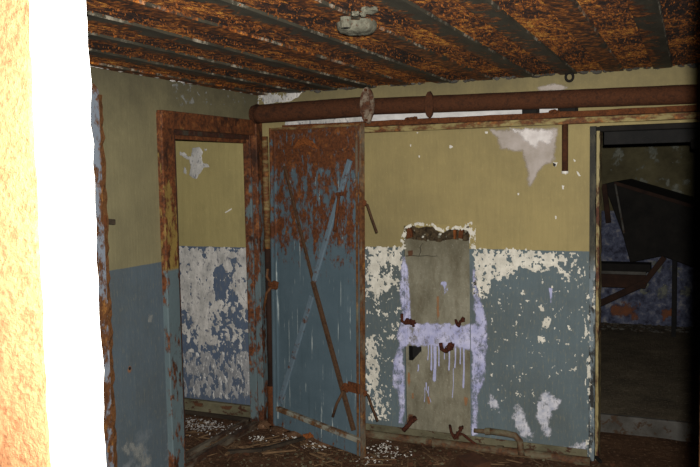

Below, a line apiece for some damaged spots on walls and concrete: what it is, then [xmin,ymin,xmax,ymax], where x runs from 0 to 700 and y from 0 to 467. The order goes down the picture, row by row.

corrosion [86,0,510,93]
peeling [180,147,209,179]
peeling [179,246,250,400]
leakage [424,343,465,402]
spalling [365,222,586,437]
peeling [549,354,592,454]